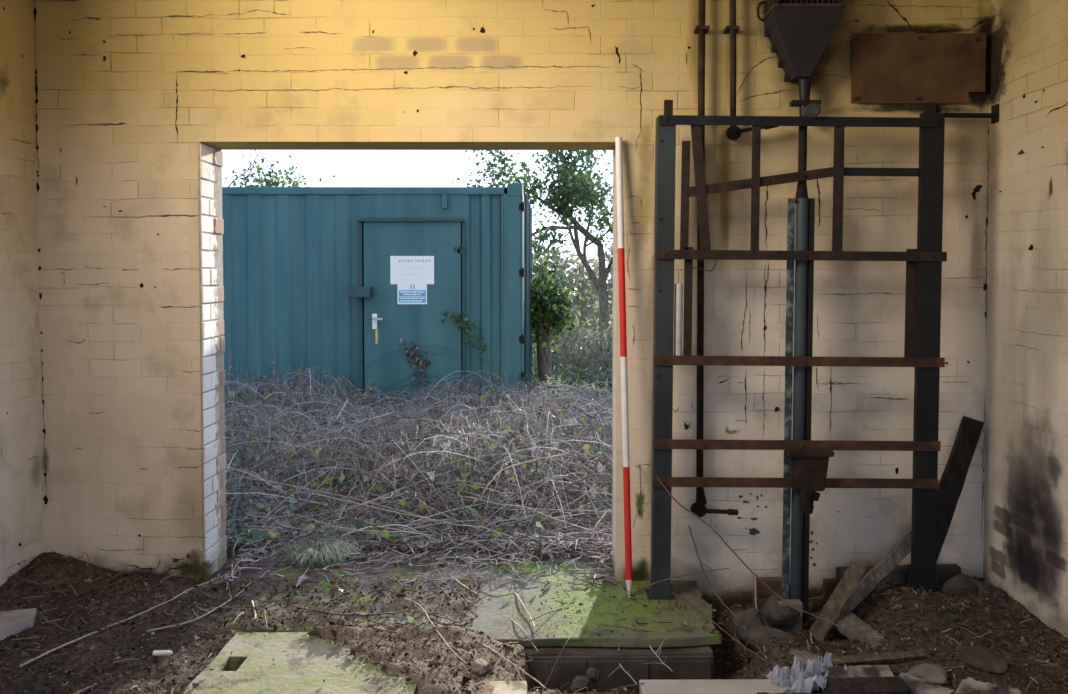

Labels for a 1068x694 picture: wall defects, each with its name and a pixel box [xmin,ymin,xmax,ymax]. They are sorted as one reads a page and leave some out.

crack [169,0,653,150]
crack [718,186,769,432]